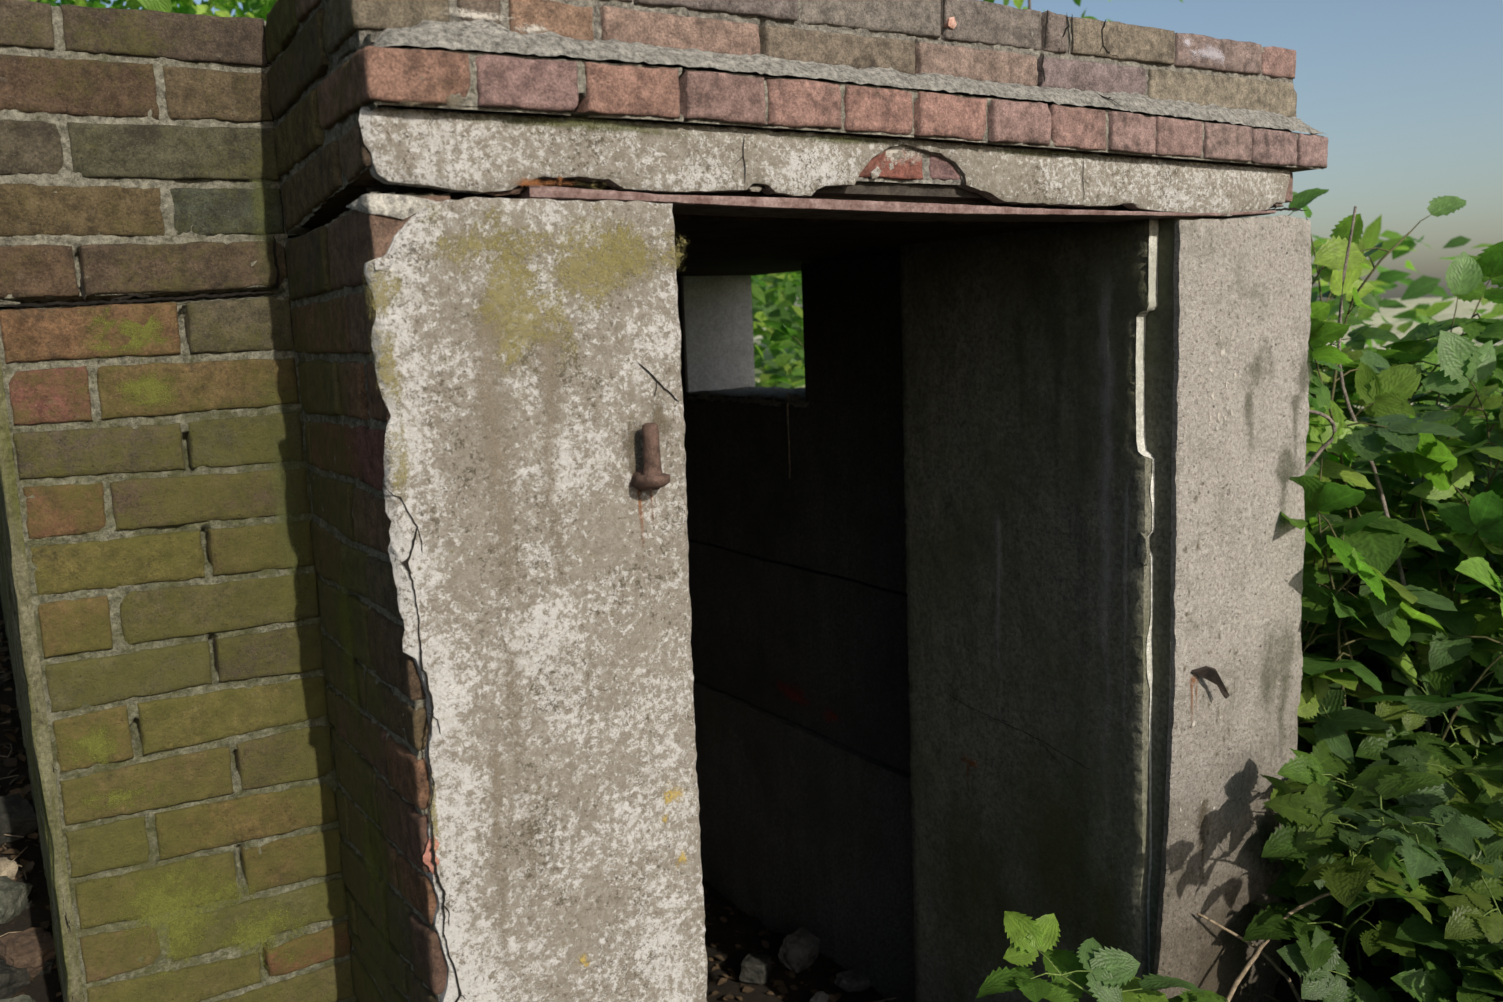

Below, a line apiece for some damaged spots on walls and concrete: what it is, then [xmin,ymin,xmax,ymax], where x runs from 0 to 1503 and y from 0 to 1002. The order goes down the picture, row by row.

spalling [869,144,964,184]
peeling [374,177,577,375]
crack [384,486,466,1002]